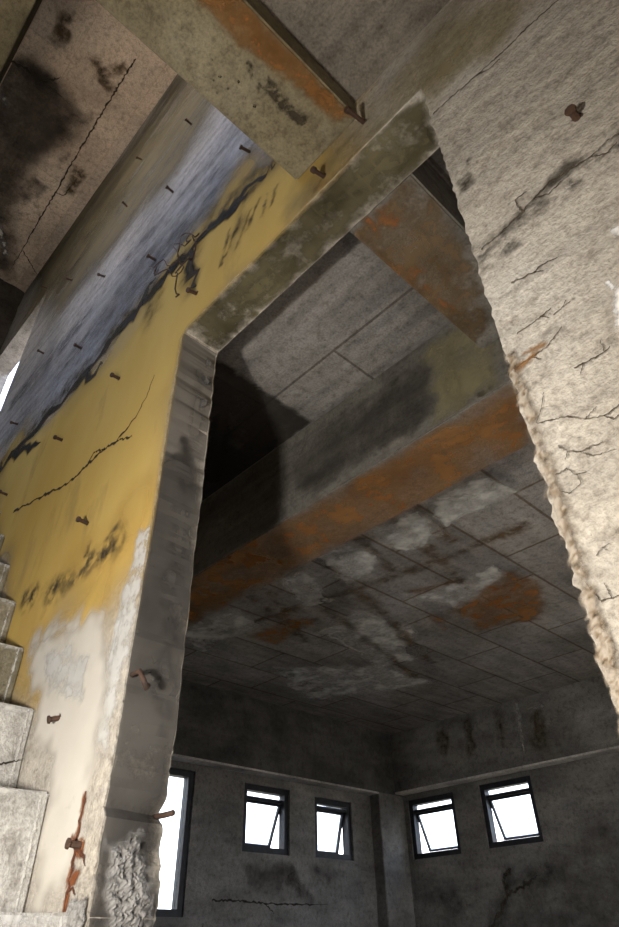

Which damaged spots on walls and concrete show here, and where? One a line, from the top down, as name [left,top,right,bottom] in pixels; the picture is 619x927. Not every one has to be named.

rust [199,0,350,117]
damp [0,62,85,271]
crack [0,163,276,472]
crack [13,377,154,513]
rust [188,396,528,622]
damp [372,478,526,565]
spalling [505,351,619,713]
crack [555,442,602,494]
crack [539,393,619,423]
damp [89,370,436,927]
rust [62,795,86,912]
spalling [104,832,153,927]